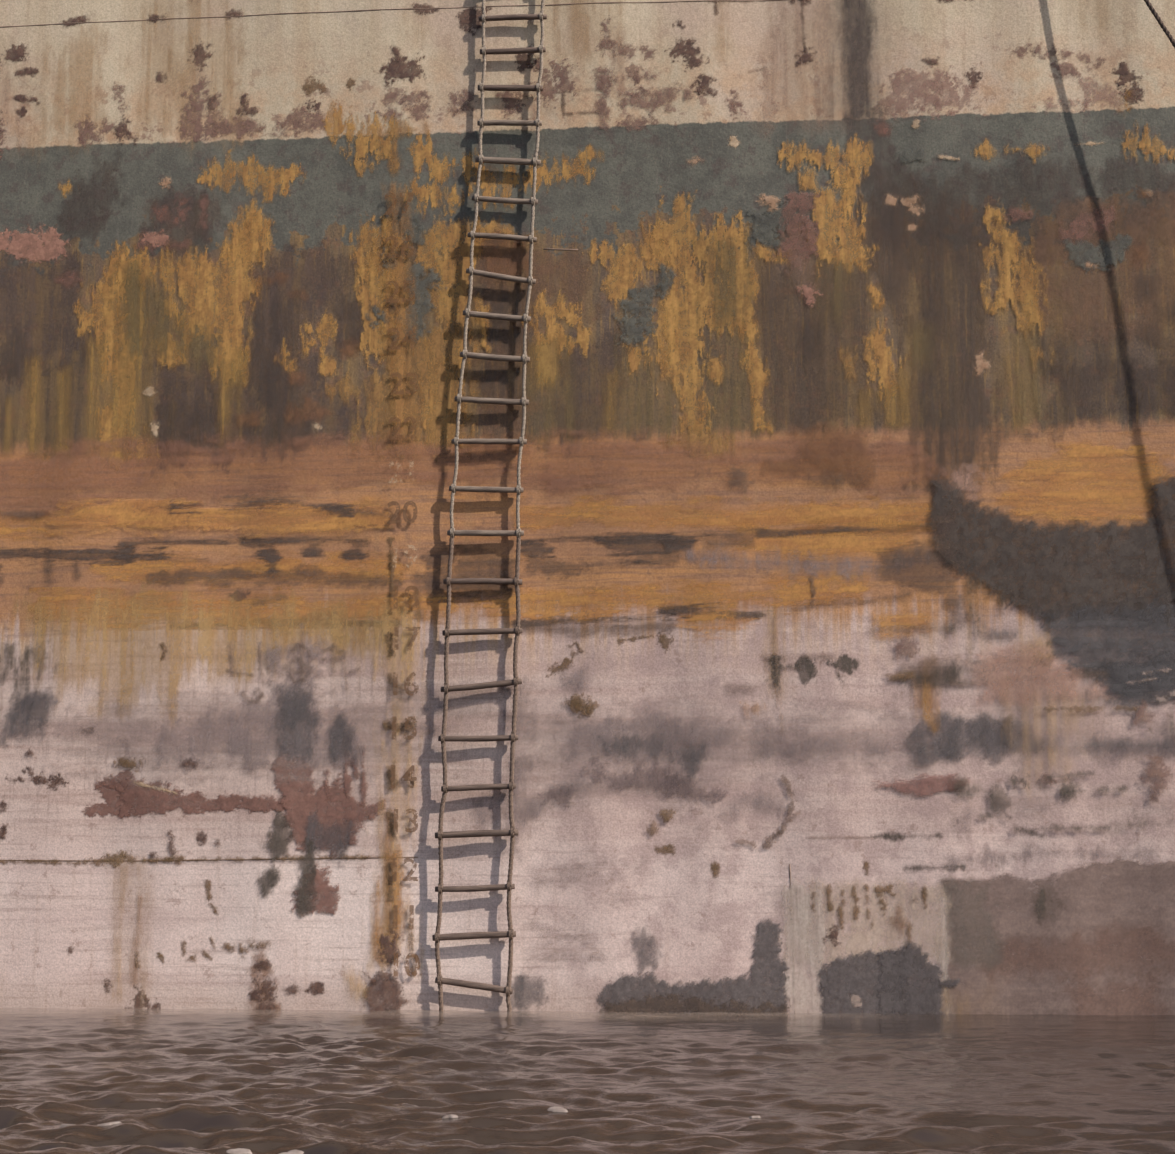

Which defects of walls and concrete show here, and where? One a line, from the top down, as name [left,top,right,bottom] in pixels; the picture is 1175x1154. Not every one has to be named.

leakage [844,0,883,148]
corrosion [0,496,932,691]
leakage [930,476,1175,724]
corrosion [546,642,598,718]
corrosion [113,745,141,772]
corrosion [382,719,417,732]
corrosion [150,830,176,858]
corrosion [647,809,675,855]
corrosion [350,809,416,1011]